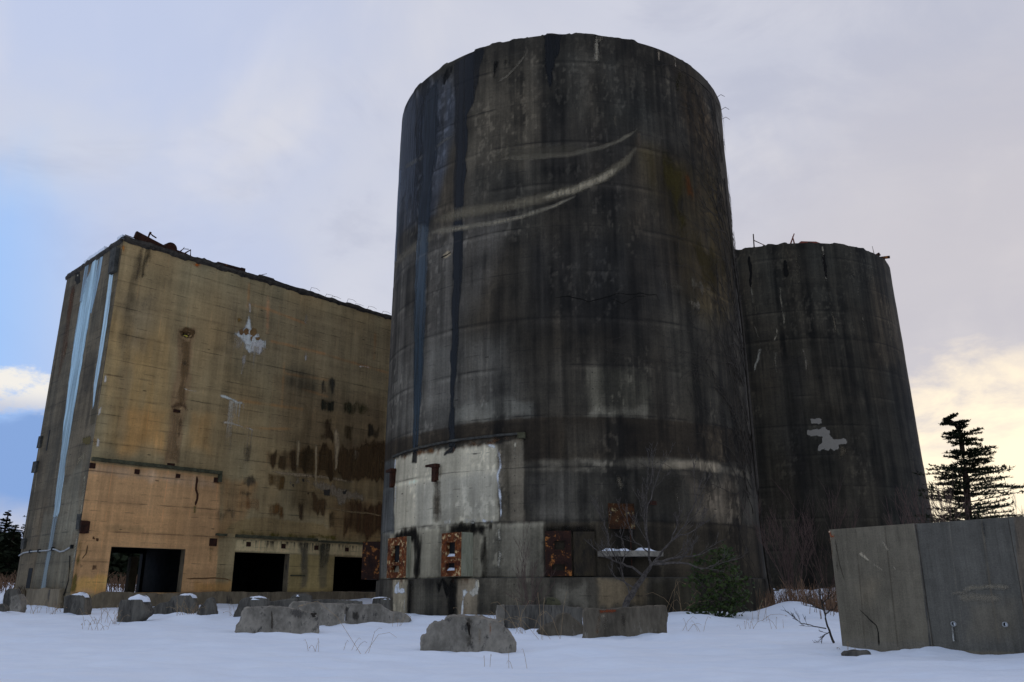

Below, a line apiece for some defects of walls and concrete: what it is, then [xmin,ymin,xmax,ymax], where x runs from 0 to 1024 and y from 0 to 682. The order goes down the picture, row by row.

water stain [394,48,484,463]
crack [746,256,754,296]
crack [754,260,789,371]
rust [171,341,189,459]
peeling [807,418,847,451]
crack [192,477,200,513]